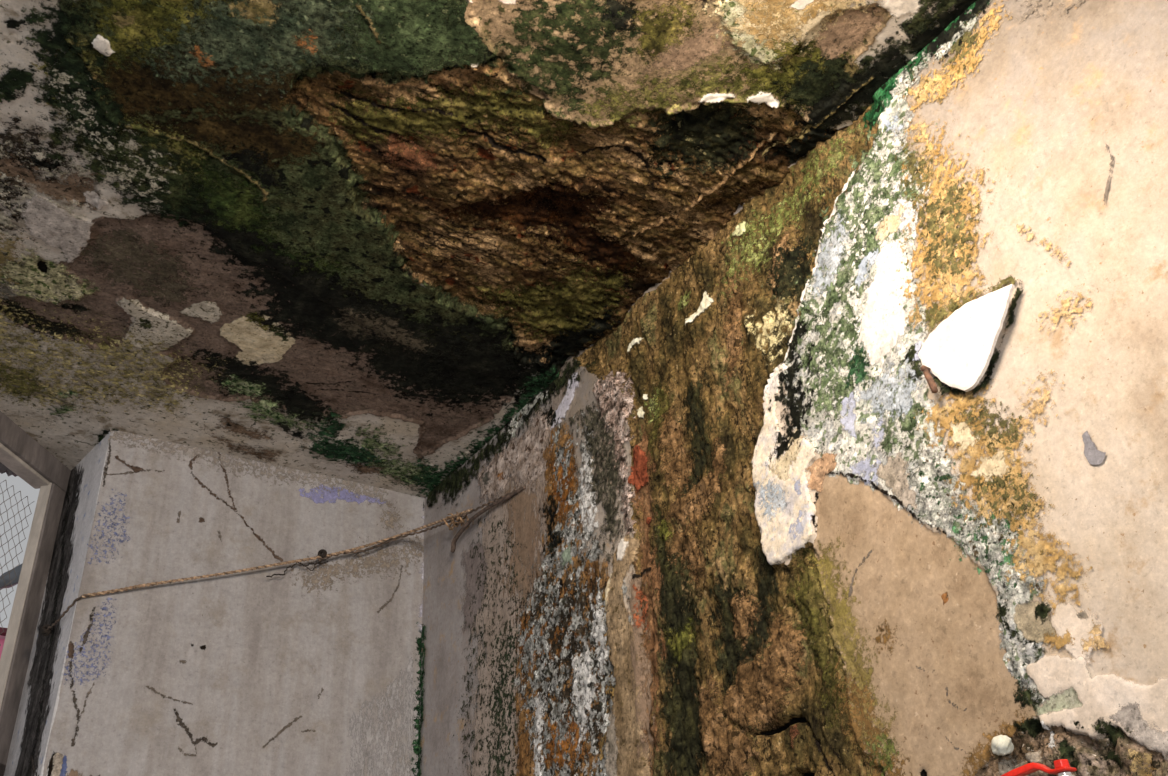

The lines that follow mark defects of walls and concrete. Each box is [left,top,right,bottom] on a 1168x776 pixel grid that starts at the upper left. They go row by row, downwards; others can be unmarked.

leakage [0,0,637,776]
spalling [283,0,1168,776]
crack [103,440,283,562]
crack [146,686,218,756]
crack [263,689,324,748]